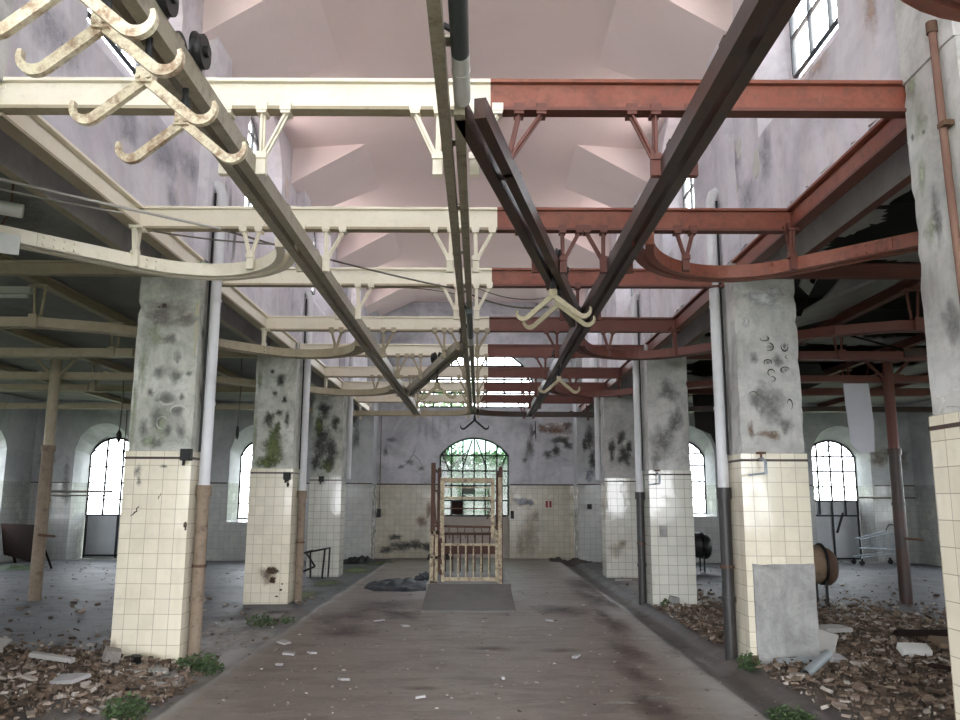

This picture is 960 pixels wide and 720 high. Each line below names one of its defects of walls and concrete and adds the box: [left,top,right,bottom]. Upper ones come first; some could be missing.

damp [148,389,183,413]
damp [264,370,289,426]
damp [312,403,339,469]
damp [523,427,595,481]
damp [608,433,631,465]
damp [653,413,681,463]
damp [752,391,789,431]
spalling [262,567,283,597]